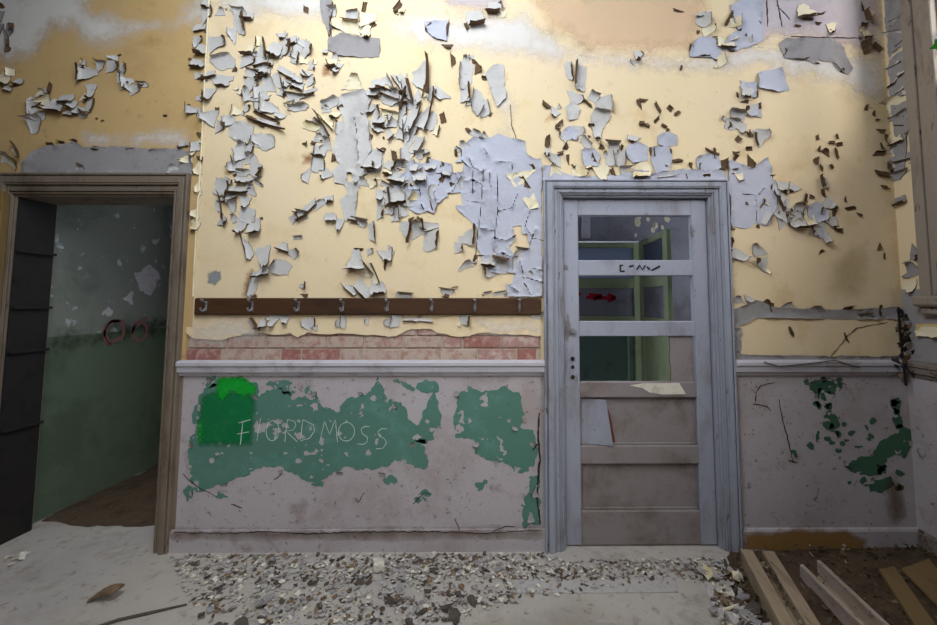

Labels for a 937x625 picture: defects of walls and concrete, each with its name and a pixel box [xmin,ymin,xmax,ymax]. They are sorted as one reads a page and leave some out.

peeling [0,0,139,92]
peeling [17,54,149,134]
peeling [0,132,203,196]
peeling [184,0,913,301]
peeling [122,265,161,305]
peeling [901,243,919,294]
peeling [734,294,905,360]
peeling [915,324,937,338]
peeling [183,376,442,504]
peeling [453,386,541,529]
peeling [804,376,913,493]